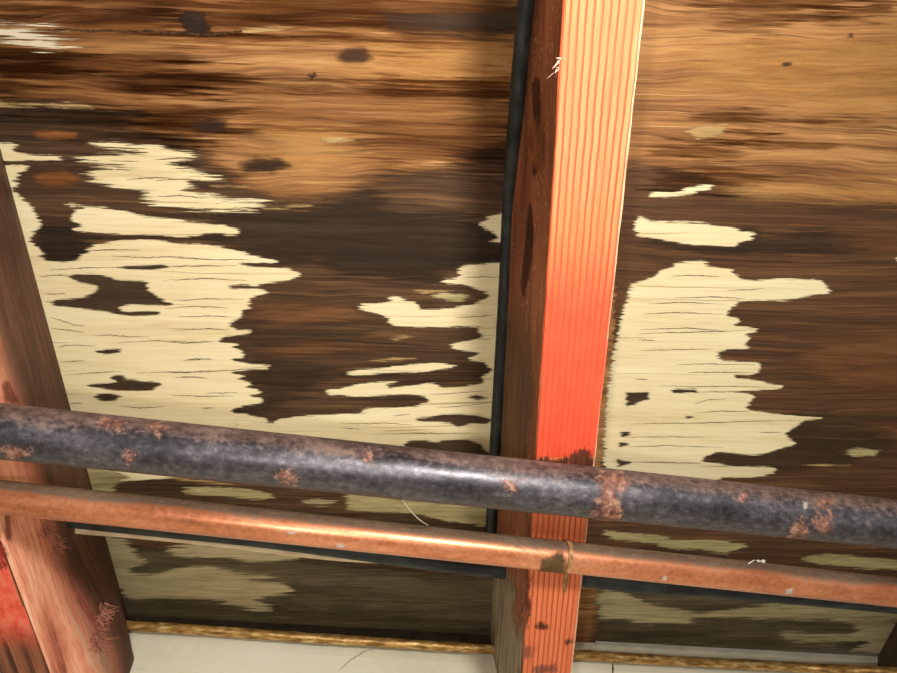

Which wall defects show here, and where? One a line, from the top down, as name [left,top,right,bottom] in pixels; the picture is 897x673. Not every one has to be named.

water stain [390,1,517,35]
peeling [648,184,713,197]
peeling [633,216,756,247]
peeling [0,141,502,453]
peeling [602,261,831,480]
peeling [304,494,486,527]
peeling [105,536,302,612]
peeling [338,569,492,604]
peeling [801,553,897,570]